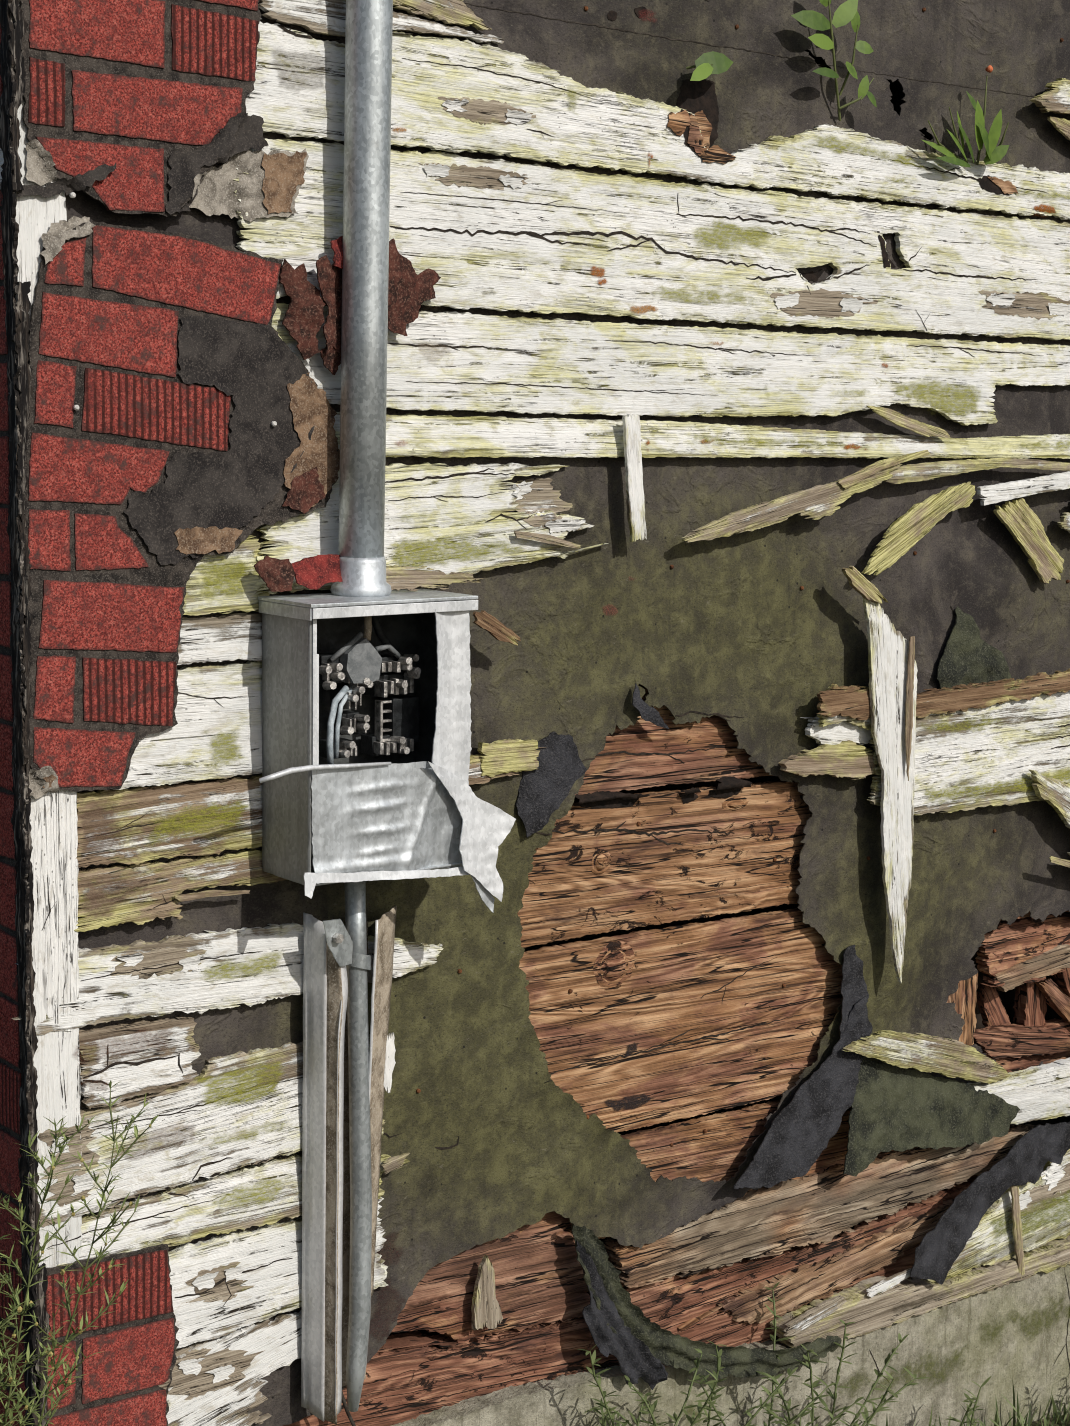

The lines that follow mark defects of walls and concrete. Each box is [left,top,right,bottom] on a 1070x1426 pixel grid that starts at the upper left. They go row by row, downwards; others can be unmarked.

peeling [438,96,536,125]
spalling [667,110,736,164]
peeling [417,162,528,190]
crack [892,160,982,180]
spalling [987,176,1018,194]
crack [390,192,1034,294]
crack [623,341,817,356]
crack [909,309,1040,357]
peeling [508,478,585,533]
peeling [111,947,207,979]
peeling [185,1262,255,1303]
peeling [157,1348,265,1400]